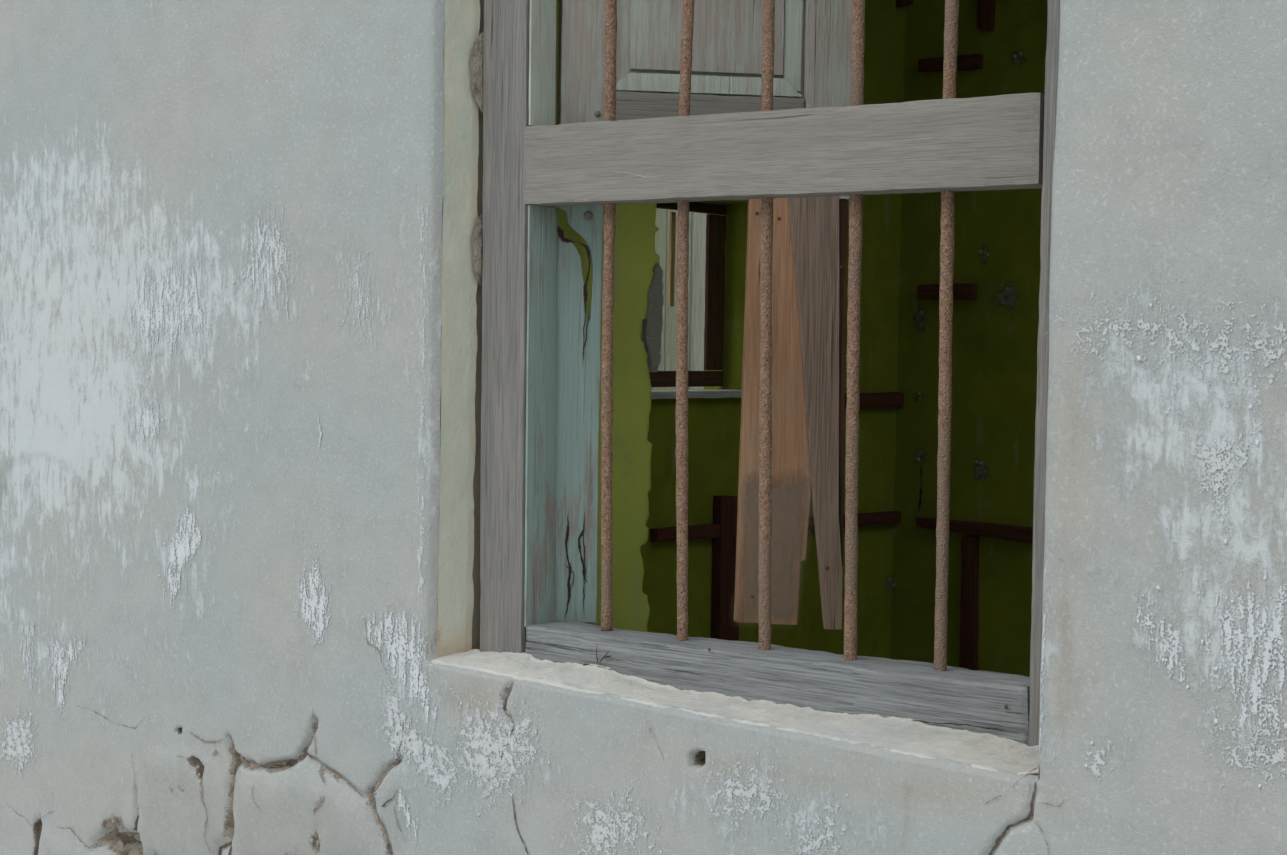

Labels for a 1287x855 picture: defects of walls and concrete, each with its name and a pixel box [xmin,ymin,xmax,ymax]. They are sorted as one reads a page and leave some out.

crack [500,681,514,763]
crack [79,706,140,831]
spalling [88,816,143,855]
crack [176,706,405,855]
crack [512,798,528,854]
crack [984,768,1065,855]